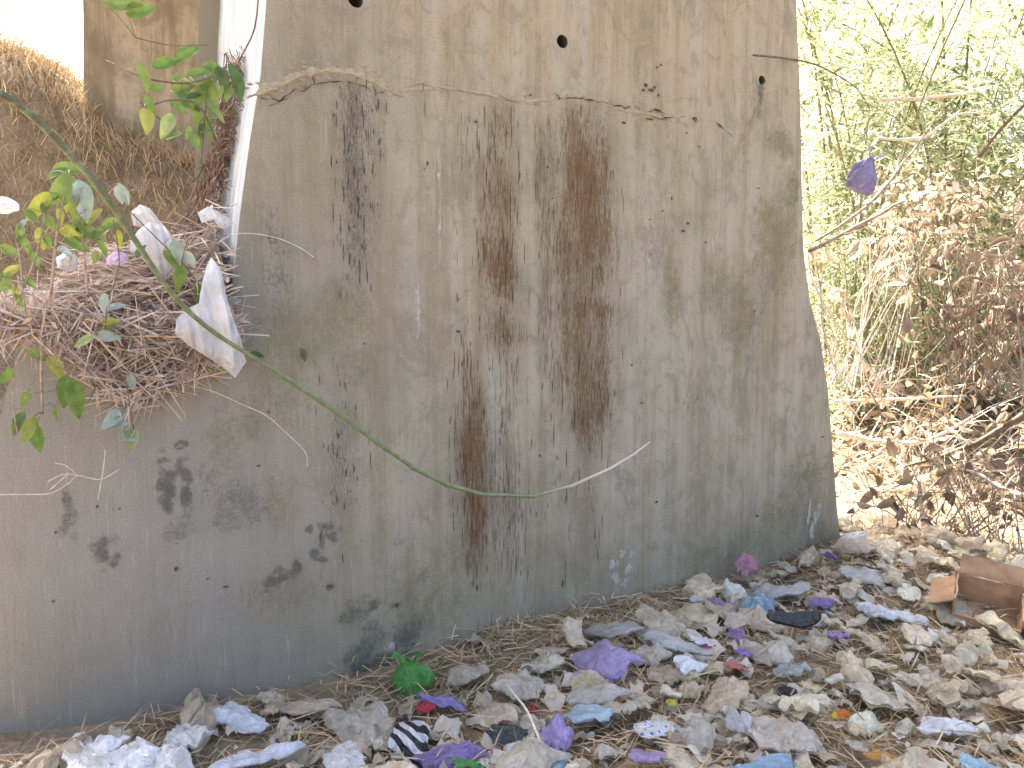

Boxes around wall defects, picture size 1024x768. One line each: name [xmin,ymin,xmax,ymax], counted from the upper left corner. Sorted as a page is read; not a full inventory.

water stain [331,76,387,299]
crack [258,76,521,113]
corrosion [472,106,527,389]
corrosion [545,103,624,468]
crack [555,93,760,135]
water stain [156,462,191,512]
corrosion [449,349,494,585]